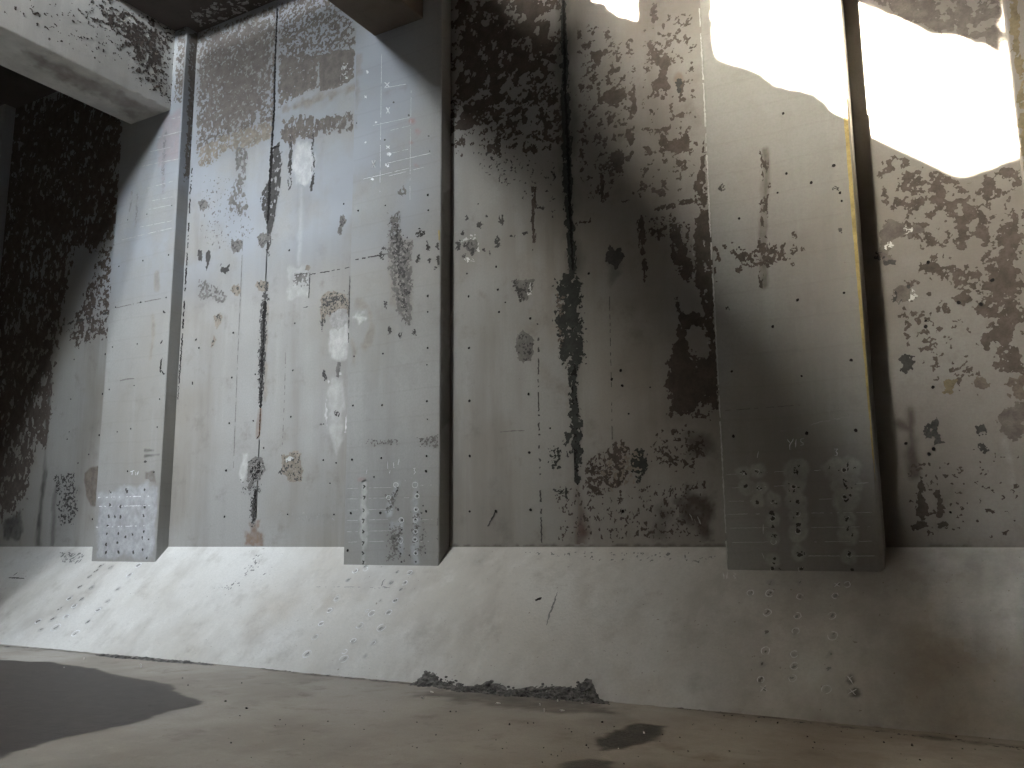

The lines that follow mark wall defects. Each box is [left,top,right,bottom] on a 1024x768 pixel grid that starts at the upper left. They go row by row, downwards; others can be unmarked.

crack [266,8,280,224]
water stain [196,80,355,308]
water stain [547,0,590,369]
water stain [755,144,774,292]
water stain [0,341,98,564]
water stain [320,295,378,463]
water stain [548,444,564,470]
water stain [890,402,926,484]